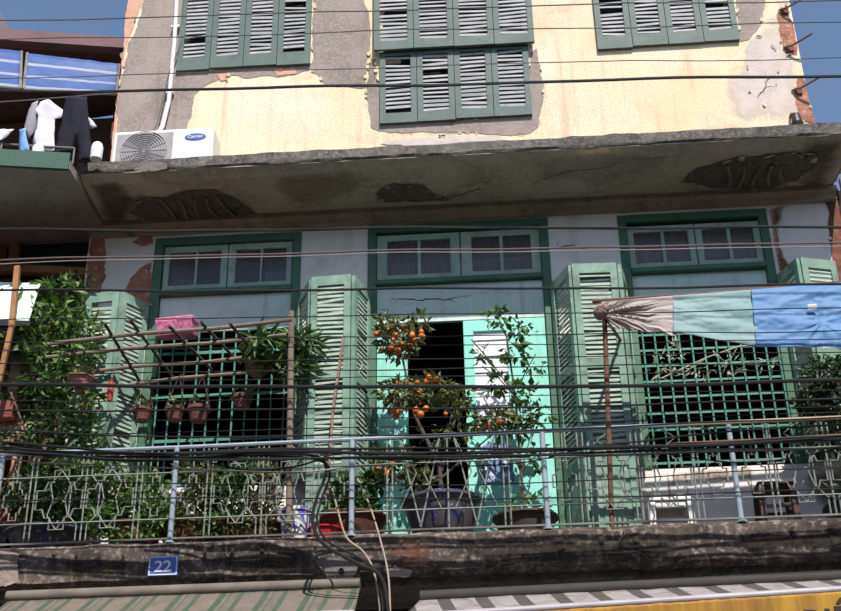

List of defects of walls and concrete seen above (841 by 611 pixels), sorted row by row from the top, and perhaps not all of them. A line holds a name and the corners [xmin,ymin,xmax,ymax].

peeling [110,0,544,161]
flaking render [728,0,815,123]
spalling [681,152,818,191]
spalling [130,189,256,221]
spalling [376,184,450,204]
flaking render [825,188,841,281]
flaking render [83,238,108,321]
flaking render [126,262,152,305]
crack [390,291,489,302]